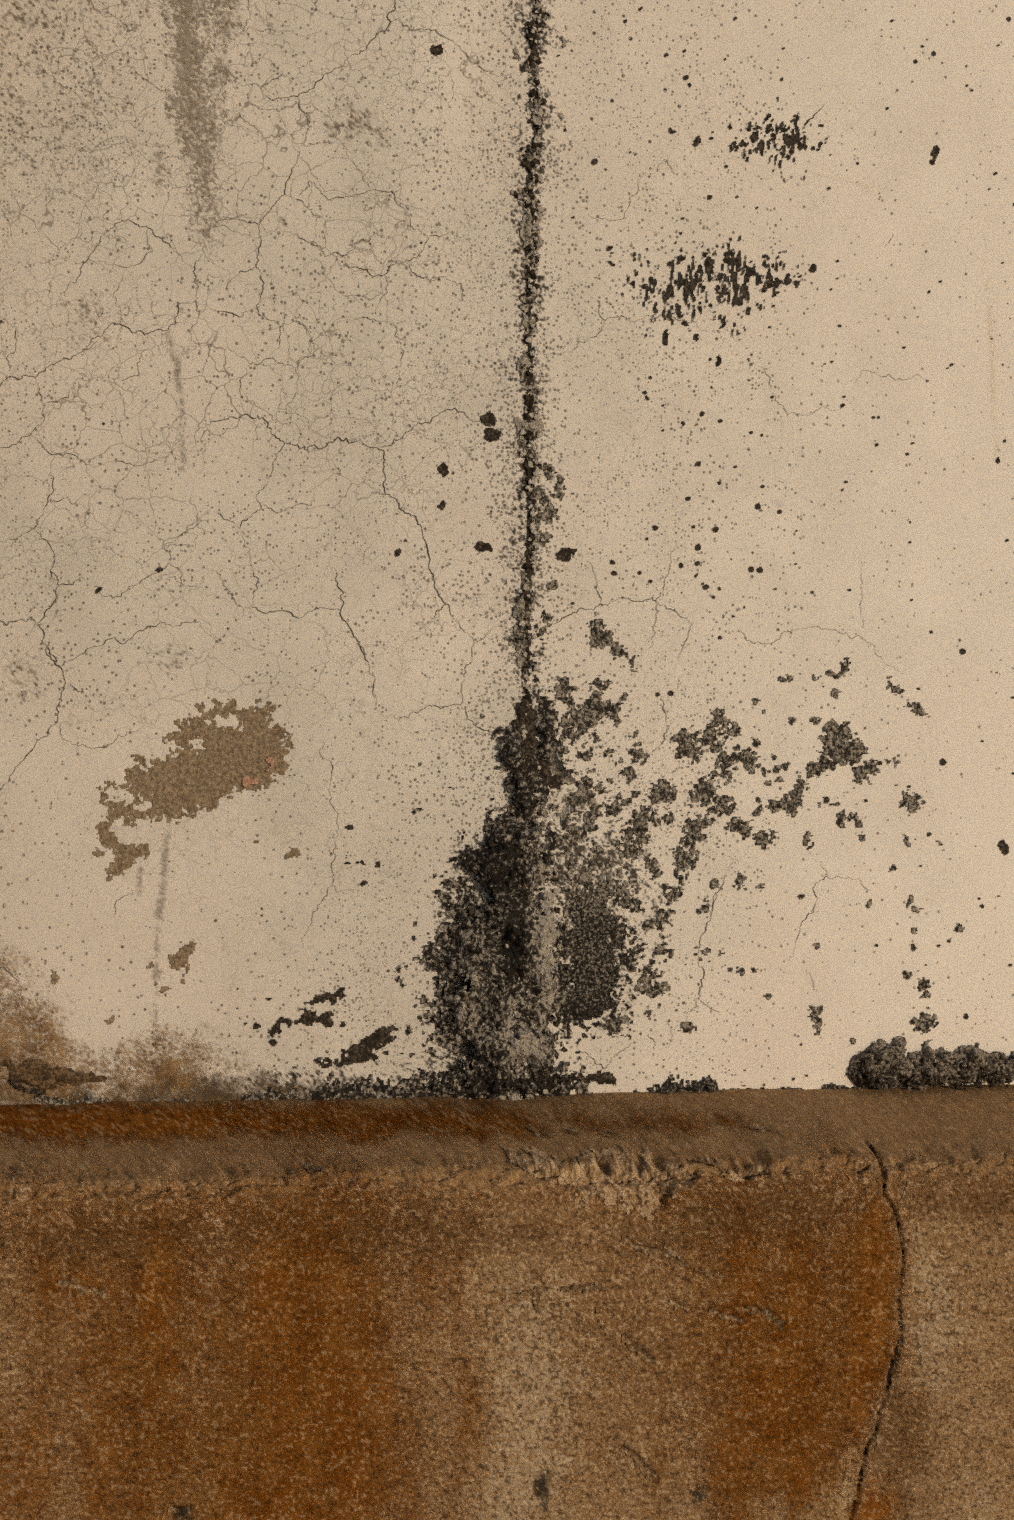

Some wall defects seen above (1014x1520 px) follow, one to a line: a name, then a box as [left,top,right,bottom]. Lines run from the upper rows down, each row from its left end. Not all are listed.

crack [0,0,703,828]
mould [581,612,639,672]
peeling [93,698,300,881]
damp [536,672,901,1036]
damp [0,948,453,1105]
rust [0,1100,732,1145]
spalling [504,1144,768,1221]
mould [634,1068,804,1094]
mould [823,970,1014,1091]
rust [132,1209,408,1520]
rust [709,1206,845,1516]
crack [852,1144,909,1506]